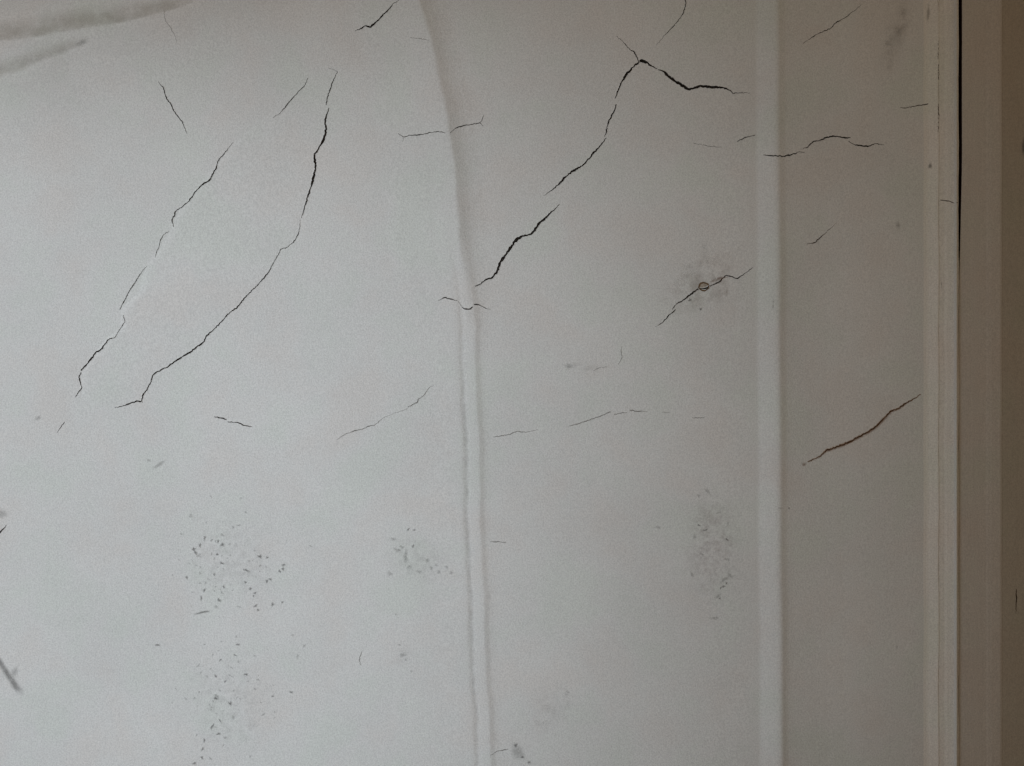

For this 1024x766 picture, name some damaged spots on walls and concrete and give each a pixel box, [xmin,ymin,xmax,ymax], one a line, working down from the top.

crack [355,0,399,32]
crack [398,115,484,142]
crack [438,0,750,310]
crack [693,134,884,158]
crack [115,68,338,408]
crack [75,142,234,397]
crack [655,267,753,327]
crack [214,416,252,427]
crack [336,385,434,440]
crack [808,394,921,462]